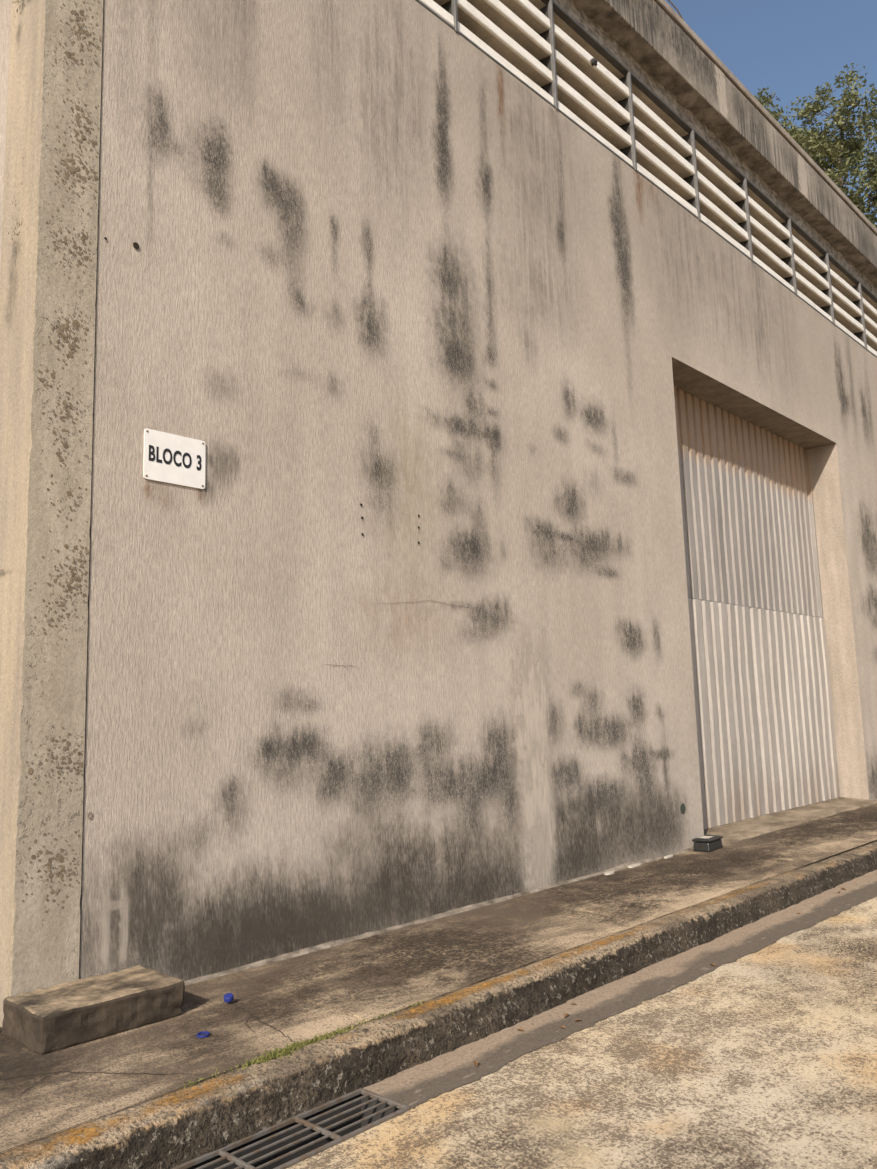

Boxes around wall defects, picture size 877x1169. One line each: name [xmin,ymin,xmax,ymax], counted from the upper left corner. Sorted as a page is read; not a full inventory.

water stain [436,77,449,182]
water stain [204,135,228,195]
water stain [262,165,301,244]
water stain [480,169,491,198]
water stain [610,175,630,304]
water stain [361,298,383,346]
water stain [437,246,471,372]
water stain [435,396,500,446]
water stain [564,389,604,428]
water stain [558,488,578,517]
water stain [533,525,622,565]
water stain [102,639,671,972]